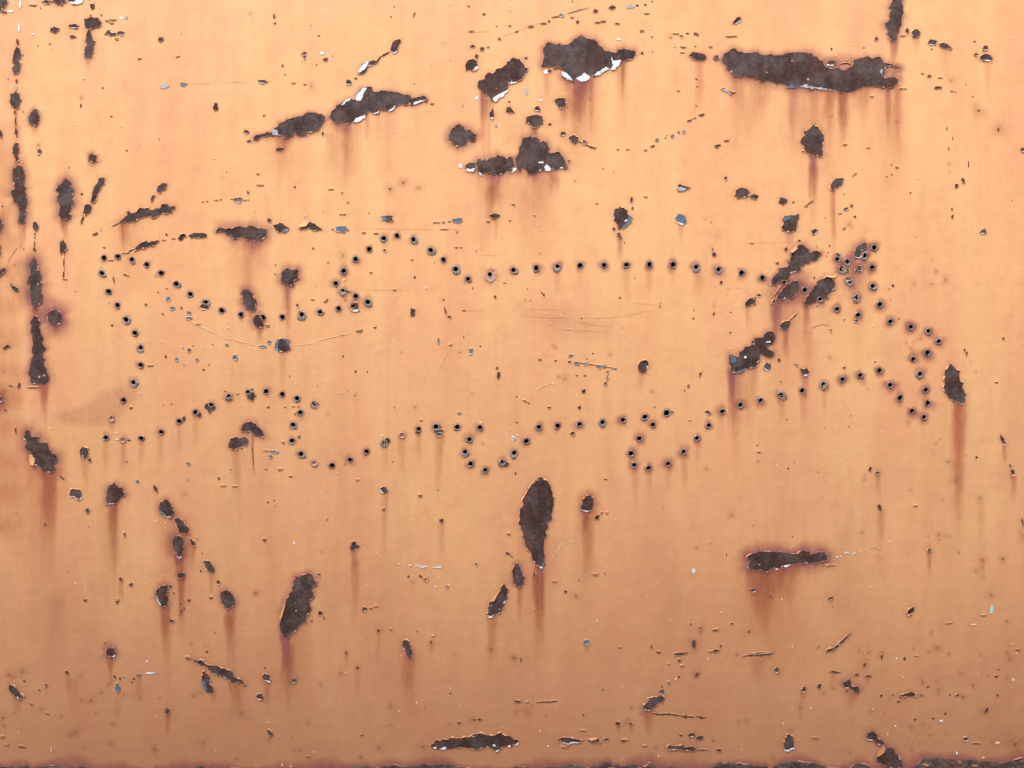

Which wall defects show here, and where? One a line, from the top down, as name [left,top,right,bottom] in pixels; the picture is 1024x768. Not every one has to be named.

peeling [244,60,434,151]
peeling [458,13,653,176]
peeling [673,0,953,98]
peeling [0,0,128,412]
peeling [745,197,867,307]
peeling [729,320,791,374]
peeling [942,363,967,406]
peeling [487,476,554,618]
peeling [278,573,325,639]
rust [310,757,471,768]
rust [513,759,878,768]
rust [903,743,1024,768]